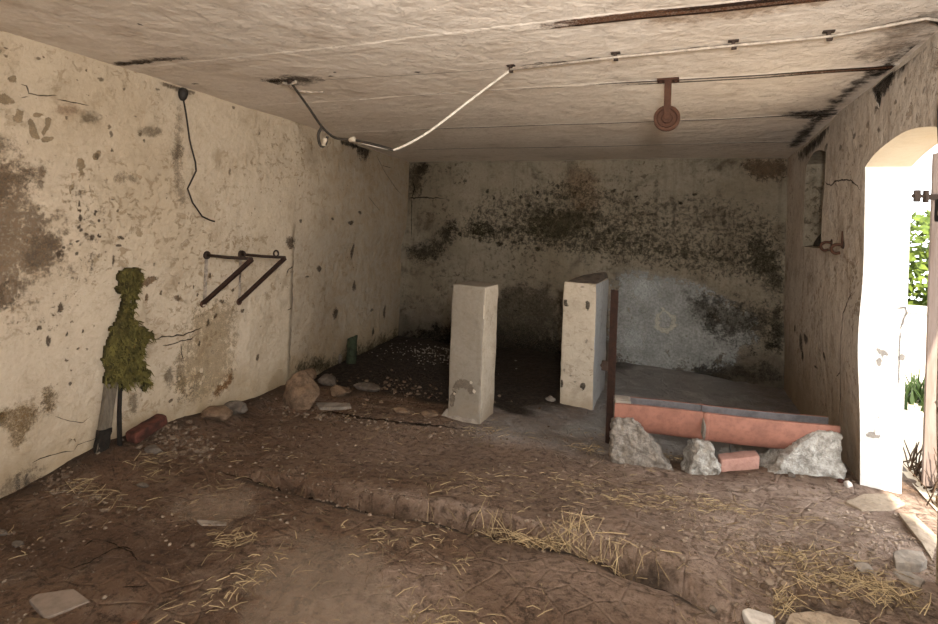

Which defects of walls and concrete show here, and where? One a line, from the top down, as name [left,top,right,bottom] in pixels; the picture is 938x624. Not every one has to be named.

corrosion [544,0,829,29]
damp [114,57,182,66]
damp [263,76,323,86]
peeling [0,93,53,142]
damp [0,141,104,309]
damp [406,178,785,384]
damp [295,323,451,373]
damp [0,387,56,447]